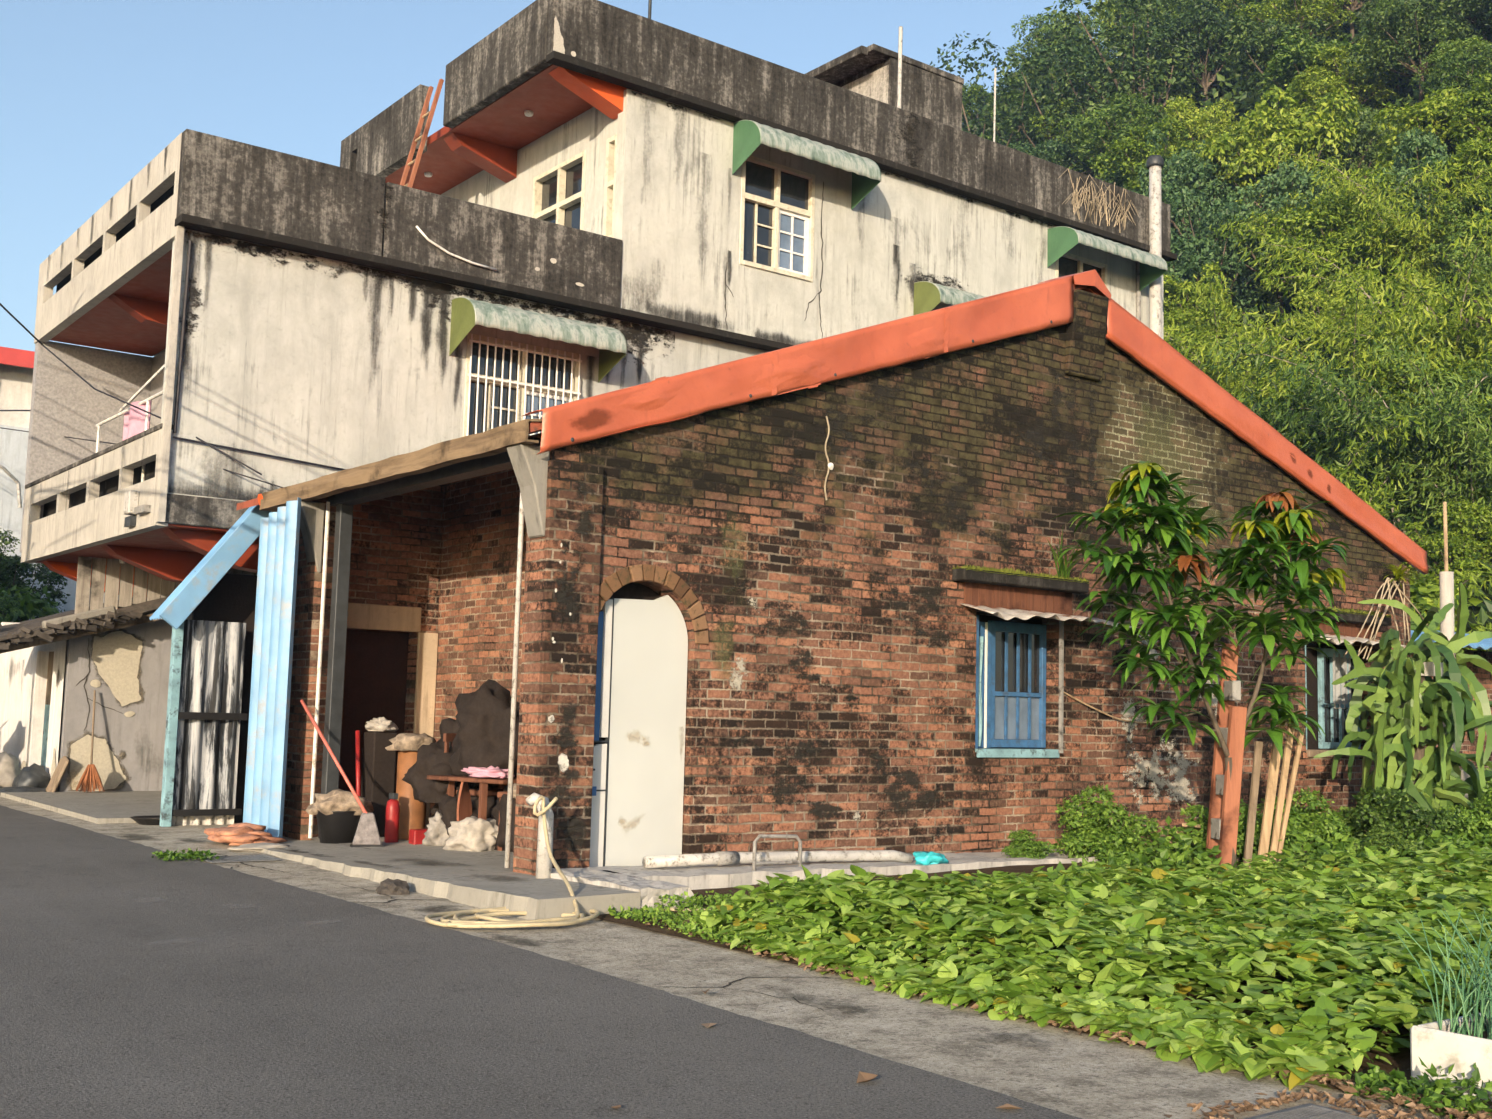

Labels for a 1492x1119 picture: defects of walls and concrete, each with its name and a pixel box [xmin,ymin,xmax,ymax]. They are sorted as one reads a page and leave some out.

damp [377,184,393,233]
crack [805,182,824,337]
damp [893,237,968,300]
damp [180,230,720,402]
damp [756,331,808,345]
crack [76,638,123,730]
peeling [1199,648,1221,715]
damp [732,734,953,842]
peeling [1120,698,1200,822]